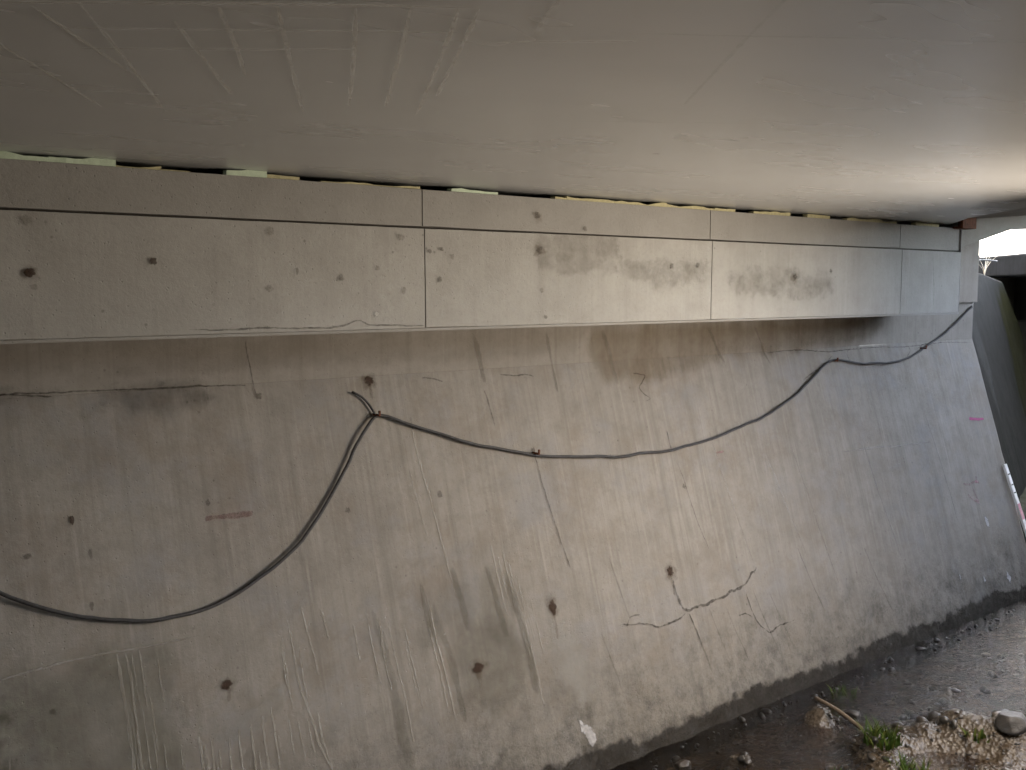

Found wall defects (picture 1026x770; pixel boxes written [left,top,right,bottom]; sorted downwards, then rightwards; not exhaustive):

crack [624,569,787,638]
damp [544,585,1026,770]